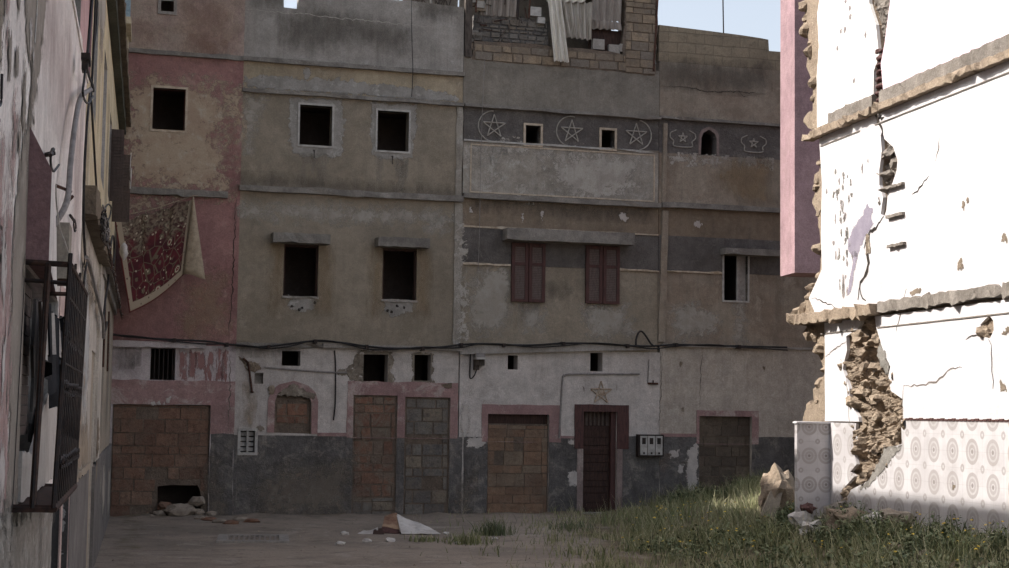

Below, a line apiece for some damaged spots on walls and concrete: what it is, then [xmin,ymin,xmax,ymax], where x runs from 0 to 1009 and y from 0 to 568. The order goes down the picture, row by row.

spalling [798,0,817,125]
spalling [874,0,890,103]
crack [875,114,884,134]
spalling [791,272,820,314]
spalling [803,325,824,355]
spalling [806,367,825,409]
spalling [837,316,906,501]
crack [902,366,962,407]